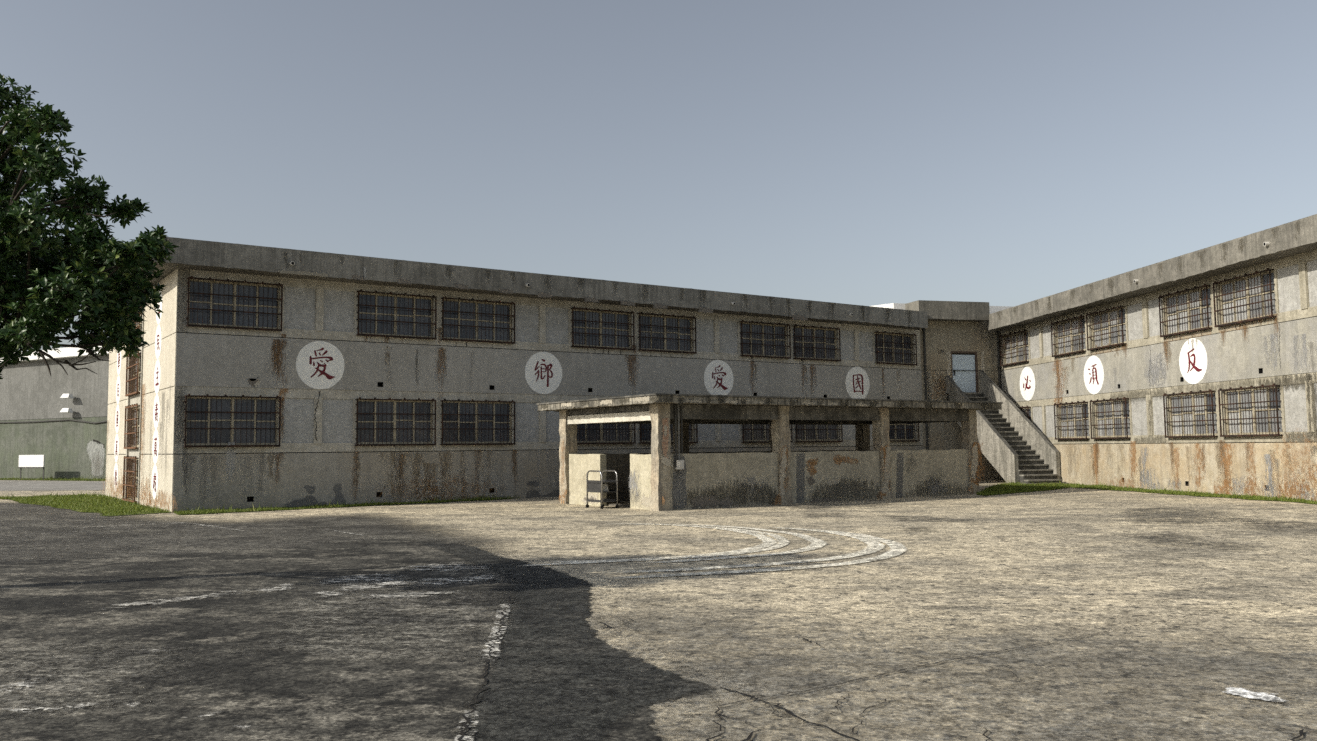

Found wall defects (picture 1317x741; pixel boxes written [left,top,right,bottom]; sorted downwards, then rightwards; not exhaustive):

rust [272,334,288,431]
rust [1195,440,1257,496]
crack [706,604,1257,741]